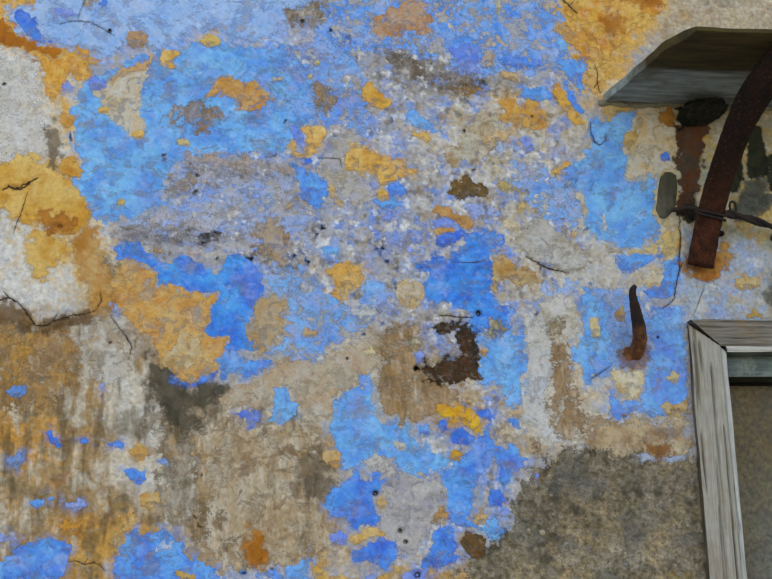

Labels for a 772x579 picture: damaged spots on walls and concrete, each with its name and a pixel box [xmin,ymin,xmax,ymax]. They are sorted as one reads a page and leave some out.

peeling [564,0,664,94]
crack [3,178,38,233]
peeling [498,105,683,299]
rust [658,107,711,217]
damp [731,125,772,221]
crack [0,291,132,359]
peeling [0,0,588,556]
peeling [530,278,689,420]
rust [678,241,733,283]
peeling [351,536,398,570]
peeling [401,526,459,579]
spalling [454,445,706,579]